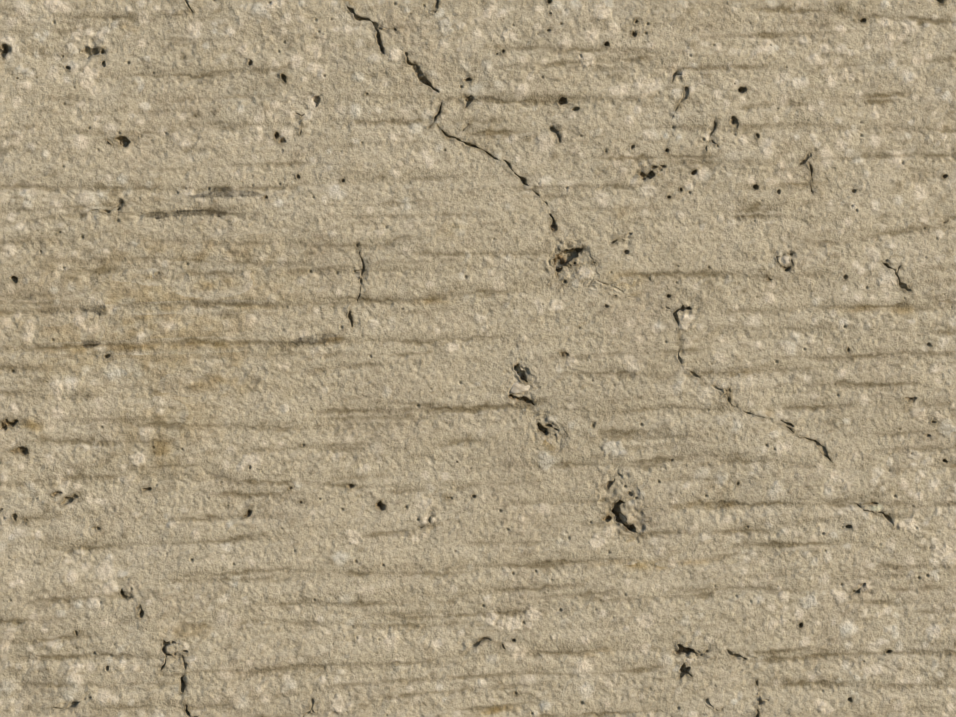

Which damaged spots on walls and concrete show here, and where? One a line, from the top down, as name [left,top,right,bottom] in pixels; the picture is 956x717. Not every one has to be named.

crack [345,4,557,225]
crack [548,126,562,144]
crack [594,276,835,466]
crack [159,639,200,717]
crack [695,647,770,717]